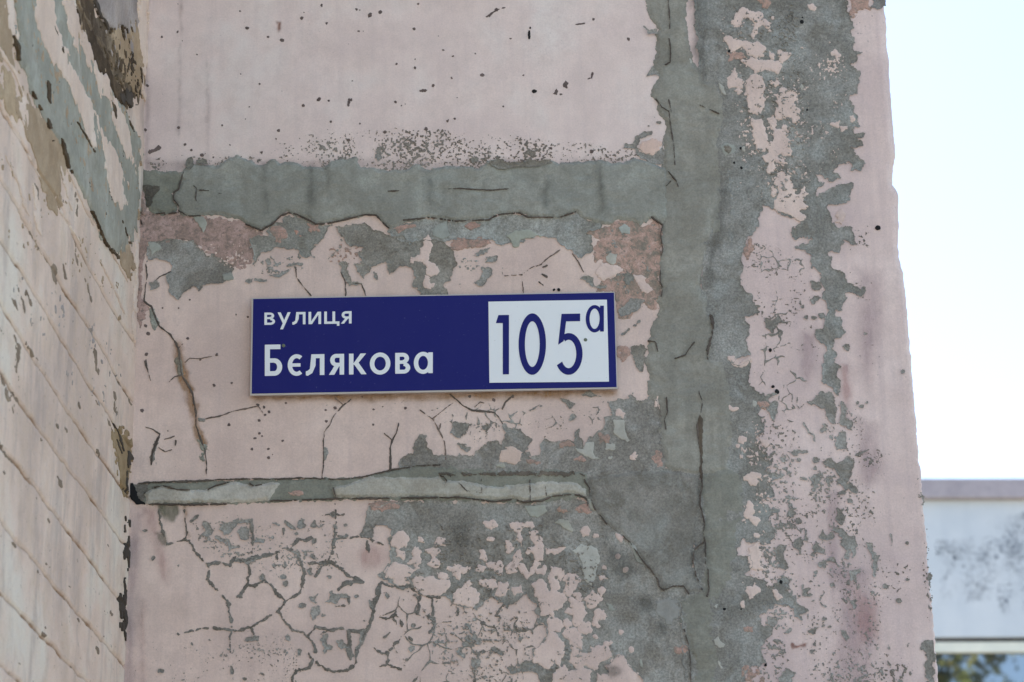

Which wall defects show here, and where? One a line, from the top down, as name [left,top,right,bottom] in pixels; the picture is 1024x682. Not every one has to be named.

peeling [0,0,663,346]
crack [245,188,576,231]
spalling [0,330,40,414]
spalling [78,325,148,505]
crack [138,264,715,682]
peeling [181,0,936,682]
peeling [158,634,302,682]